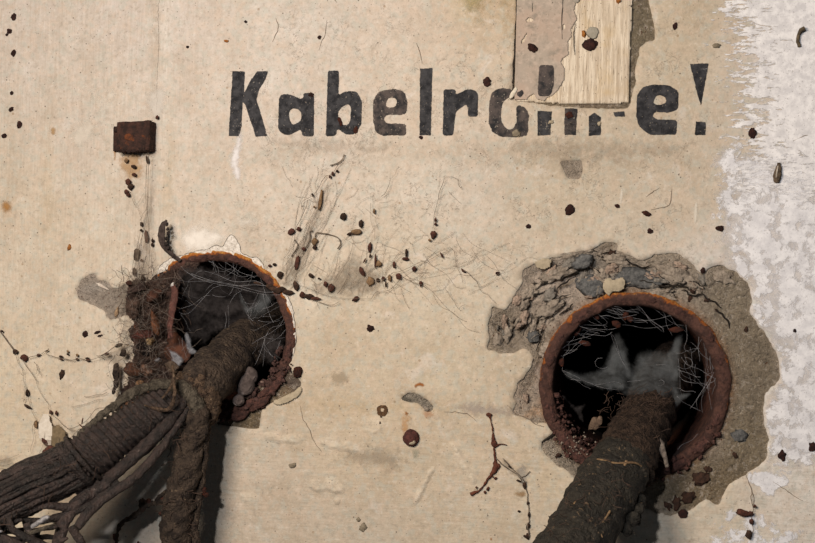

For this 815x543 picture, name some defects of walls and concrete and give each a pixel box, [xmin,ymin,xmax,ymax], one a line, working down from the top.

flaking render [529,0,655,109]
rust [122,154,140,177]
rust [167,282,178,339]
spalling [487,143,815,516]